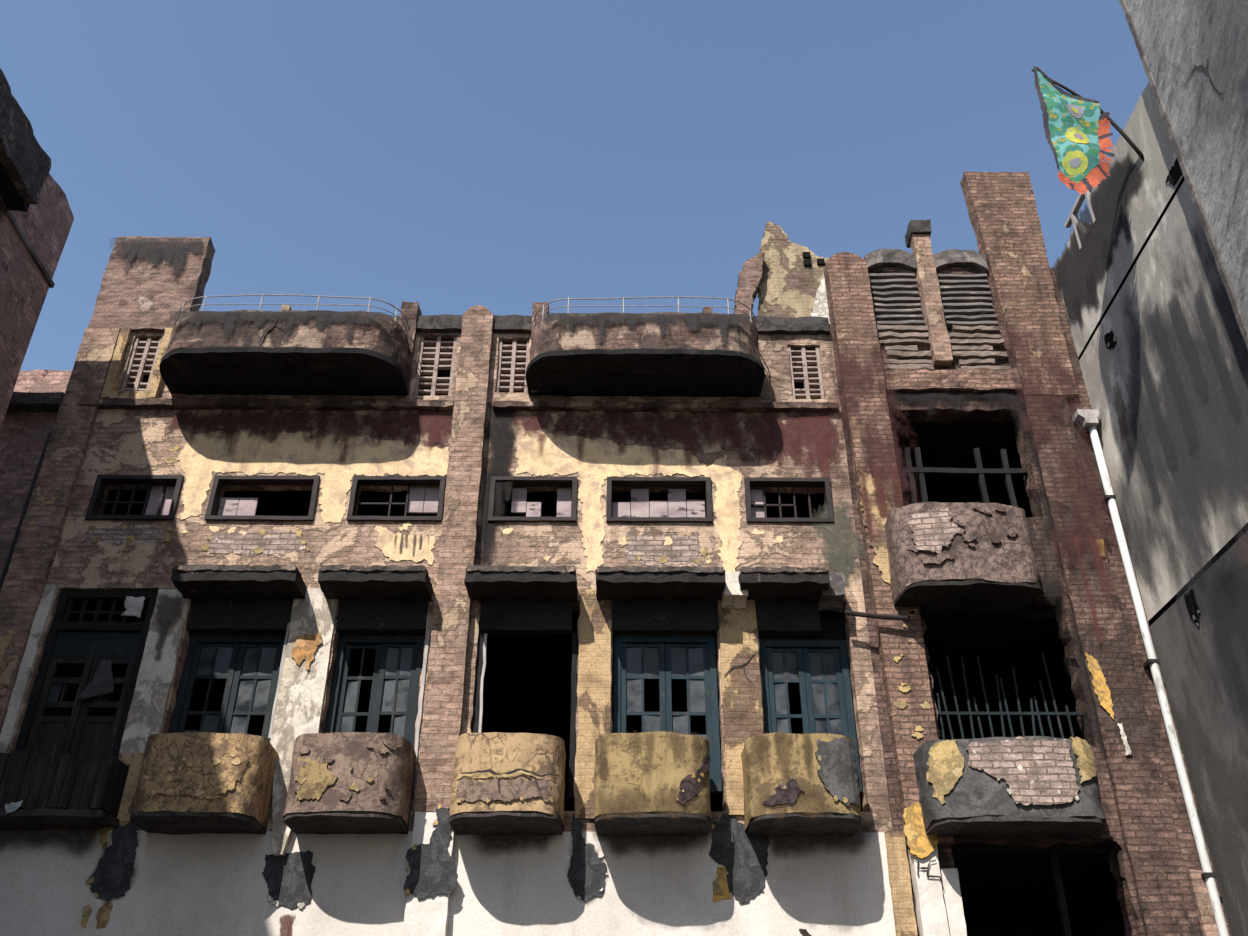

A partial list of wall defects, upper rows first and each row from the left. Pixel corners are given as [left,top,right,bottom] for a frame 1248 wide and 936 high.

leakage [1053,154,1142,326]
leakage [158,408,453,461]
leakage [514,345,897,478]
leakage [849,426,908,535]
spalling [855,469,1018,586]
leakage [1054,233,1248,709]
peeling [1085,652,1131,755]
spalling [261,850,317,909]
spalling [404,777,556,899]
spalling [567,814,608,902]
spalling [709,812,770,904]
flaking render [902,725,1096,859]